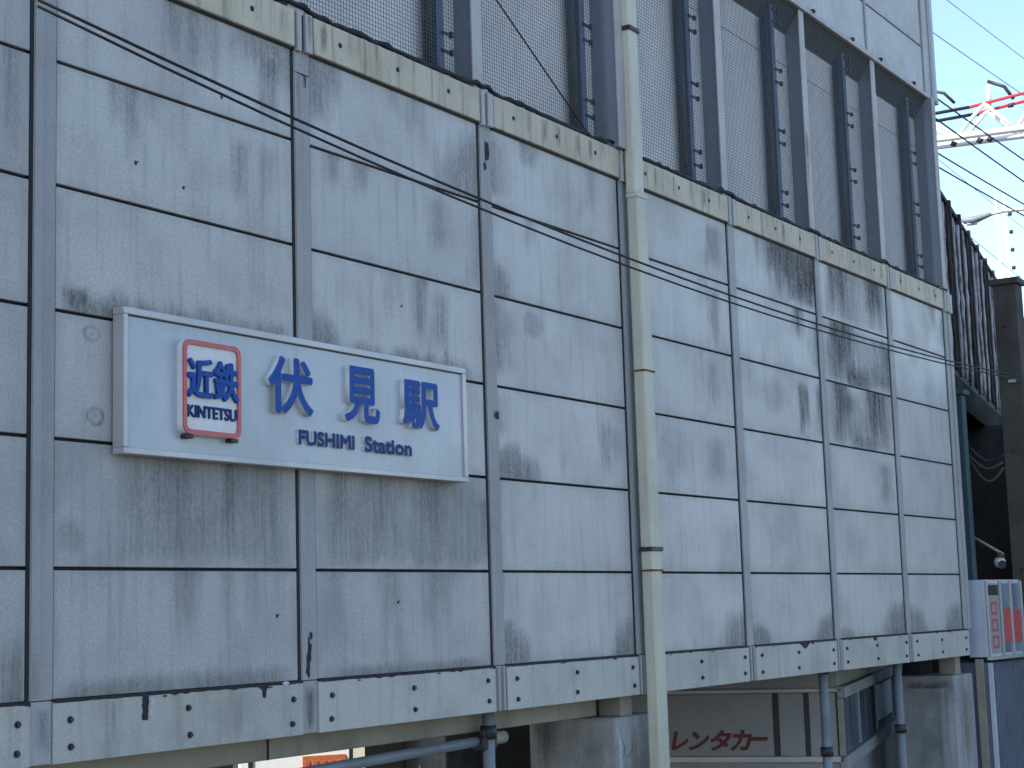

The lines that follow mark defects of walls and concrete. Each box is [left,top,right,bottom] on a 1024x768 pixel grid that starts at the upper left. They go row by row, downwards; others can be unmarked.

spalling [142,696,155,720]